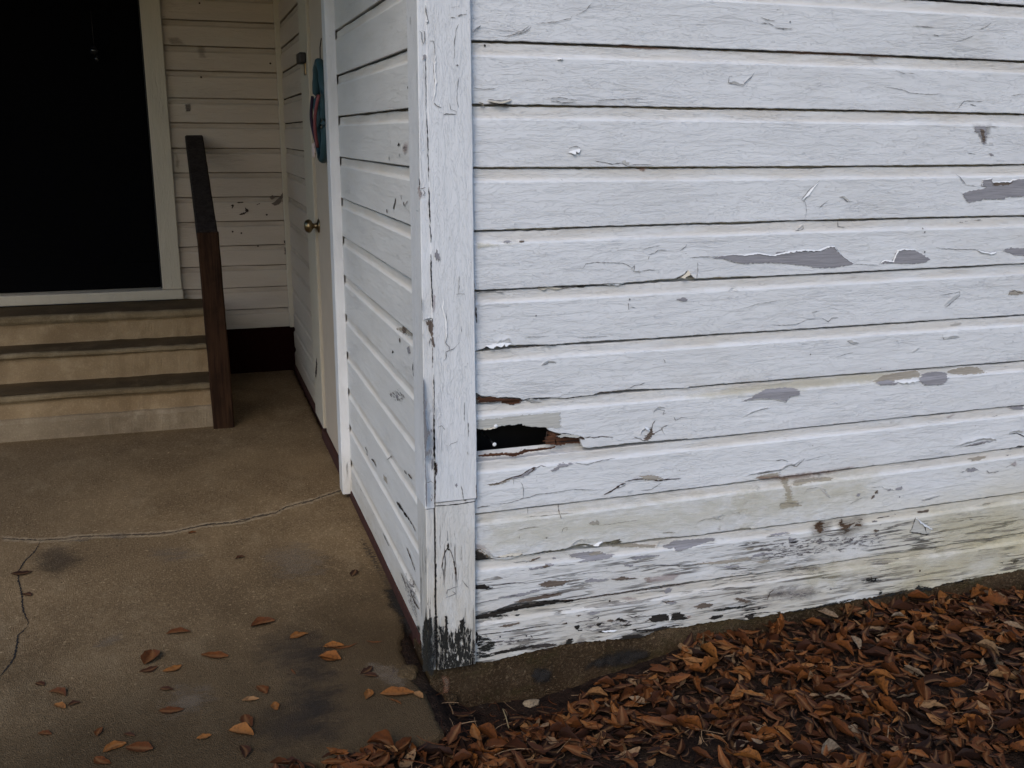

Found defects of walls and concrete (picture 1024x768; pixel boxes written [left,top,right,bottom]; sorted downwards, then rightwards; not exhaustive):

peeling [974,126,996,144]
peeling [956,174,1024,203]
peeling [693,246,1024,268]
peeling [873,367,984,385]
peeling [741,387,800,417]
peeling [954,438,1015,473]
peeling [778,477,833,510]
peeling [475,532,883,599]
crack [1,489,342,675]
peeling [574,611,642,633]
damp [437,615,556,670]